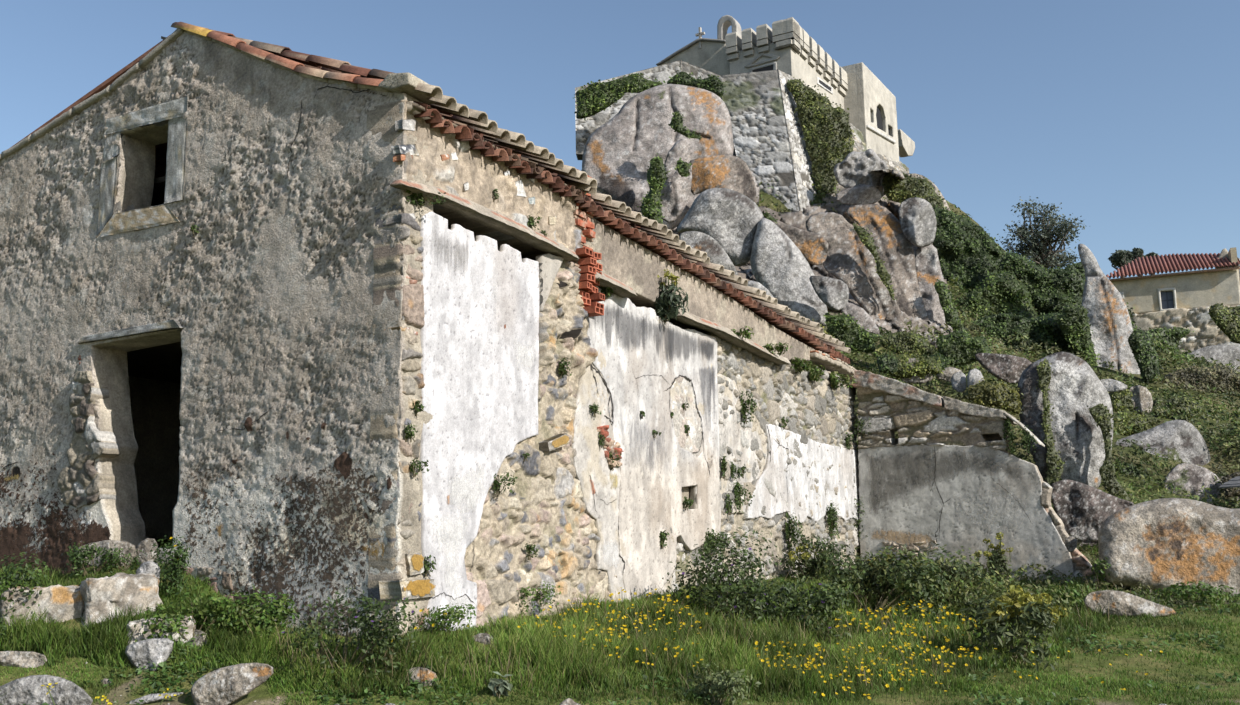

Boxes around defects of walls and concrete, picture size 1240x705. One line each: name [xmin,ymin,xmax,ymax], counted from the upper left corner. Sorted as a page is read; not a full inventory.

crack [287,83,369,177]
spalling [0,350,121,580]
peeling [180,452,392,637]
spalling [464,259,624,627]
water stain [594,308,714,421]